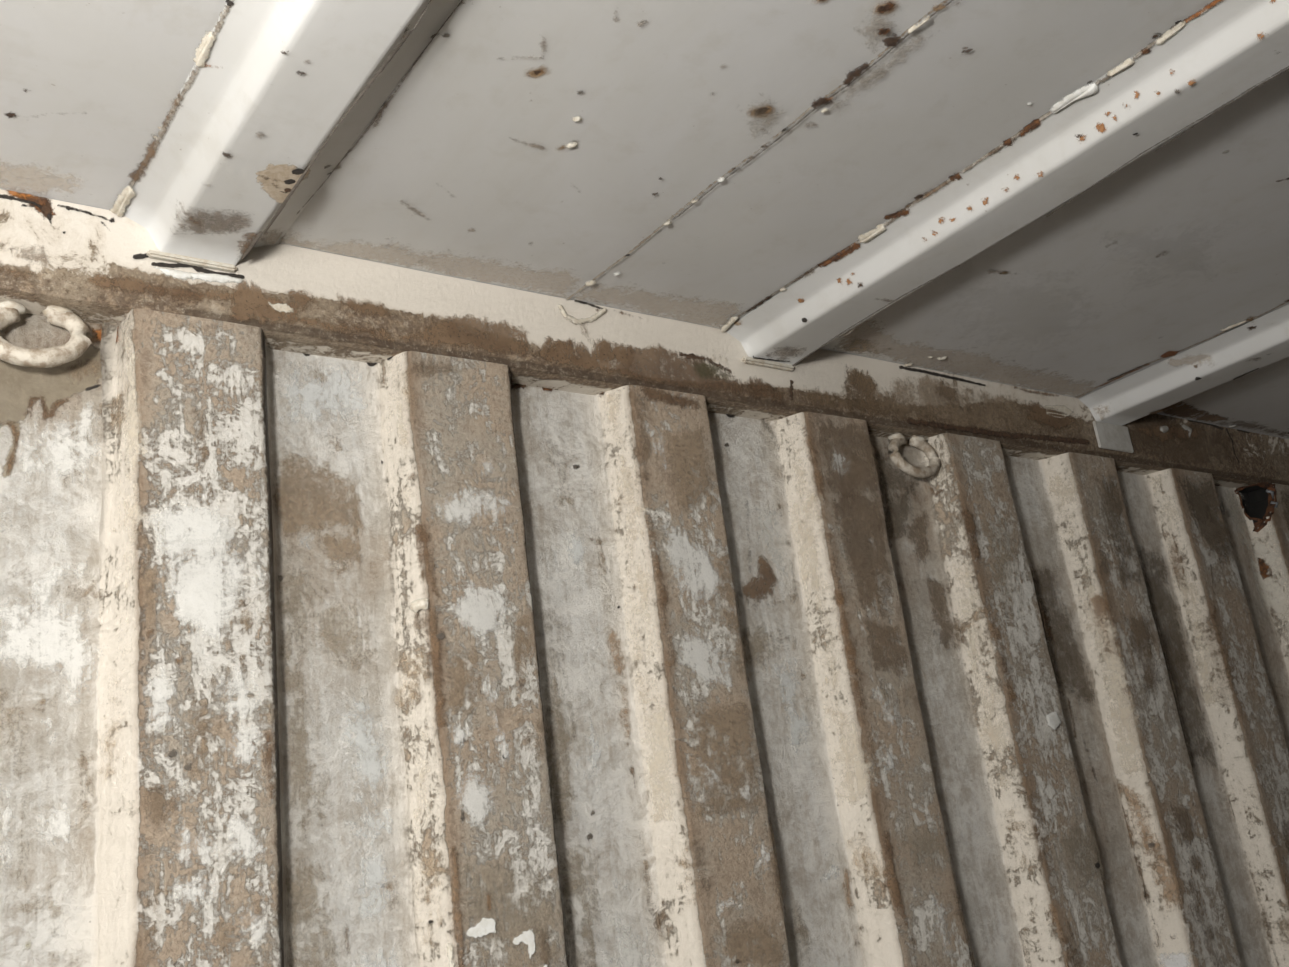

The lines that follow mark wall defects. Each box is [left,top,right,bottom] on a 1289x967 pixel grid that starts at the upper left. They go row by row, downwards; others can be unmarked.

corrosion [812,62,869,108]
corrosion [988,119,1041,155]
corrosion [7,190,55,219]
peeling [256,162,311,204]
corrosion [884,172,961,219]
corrosion [794,242,860,282]
leakage [753,265,960,366]
leakage [0,345,102,477]
peeling [123,503,261,636]
peeling [416,524,506,745]
peeling [451,847,496,967]
peeling [513,929,548,967]